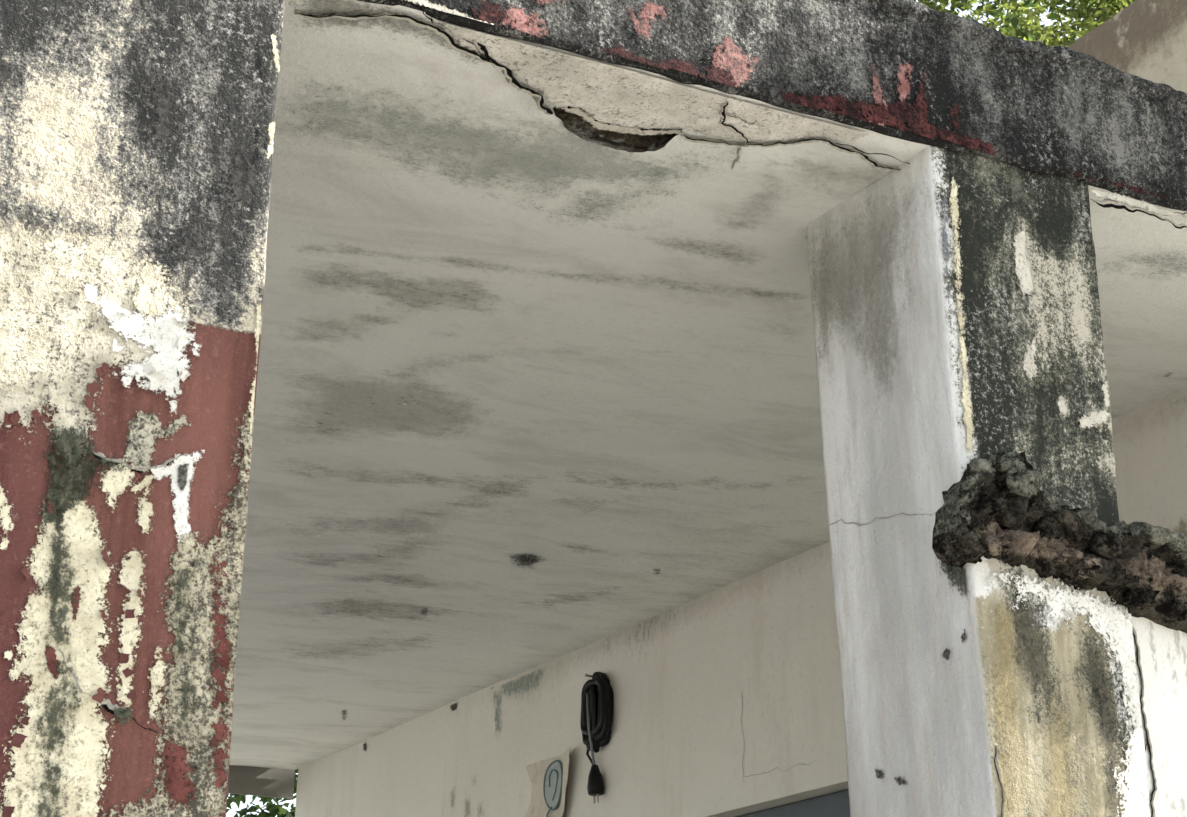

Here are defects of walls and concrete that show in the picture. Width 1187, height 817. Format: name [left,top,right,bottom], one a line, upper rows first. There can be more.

crack [294,0,553,115]
crack [680,100,910,171]